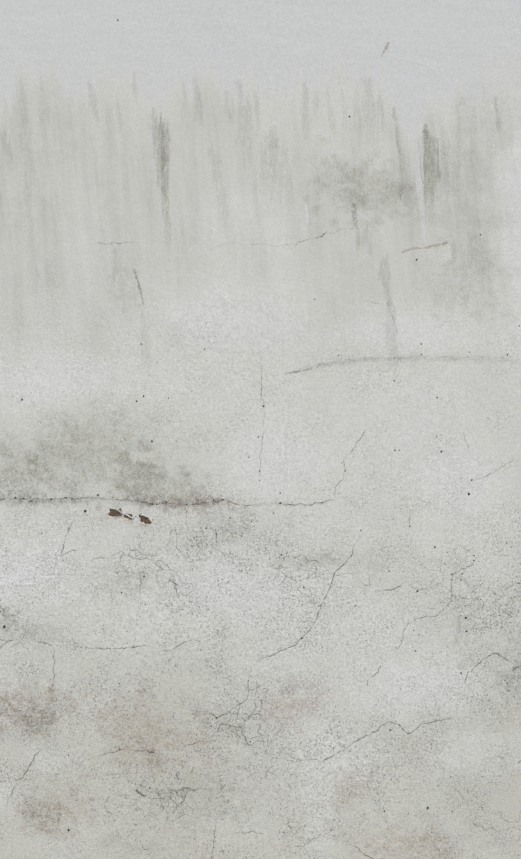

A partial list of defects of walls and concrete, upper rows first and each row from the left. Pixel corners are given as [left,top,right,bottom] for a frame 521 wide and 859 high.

crack [189,687,266,746]